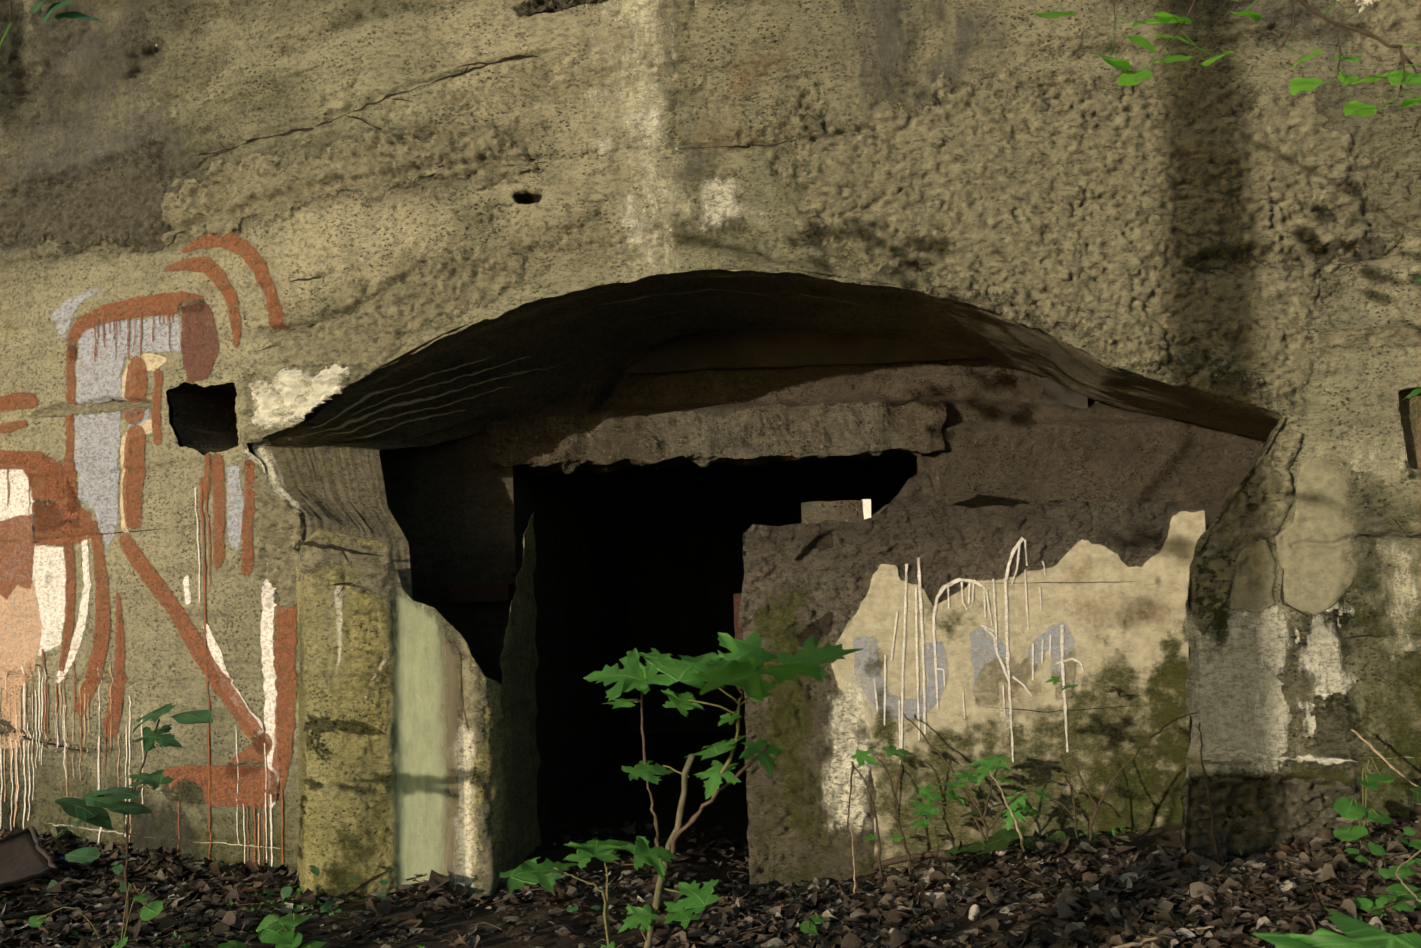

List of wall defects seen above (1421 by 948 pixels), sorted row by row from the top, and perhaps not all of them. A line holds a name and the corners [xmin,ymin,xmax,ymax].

spalling [517,0,608,16]
spalling [1338,0,1421,73]
damp [1387,543,1418,651]